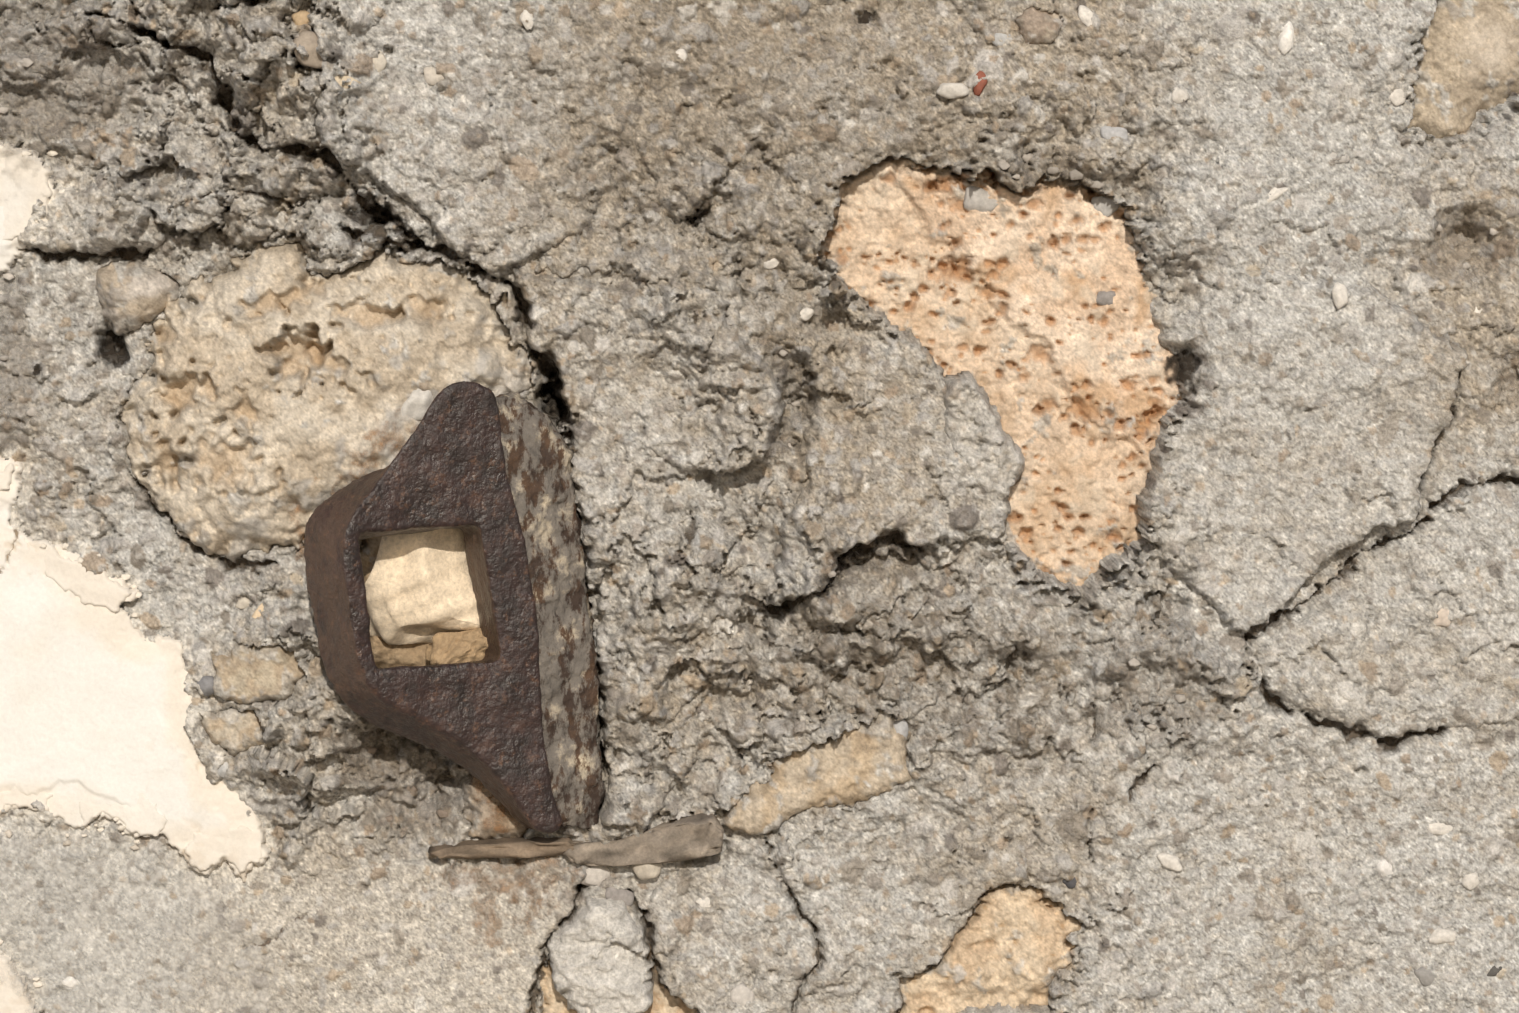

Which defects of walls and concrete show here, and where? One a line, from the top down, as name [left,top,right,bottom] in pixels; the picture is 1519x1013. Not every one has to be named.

spalling [0,2,147,242]
crack [217,0,272,9]
flaking render [1407,0,1519,139]
crack [20,247,149,263]
crack [88,2,574,439]
flaking render [119,242,535,563]
flaking render [816,147,1186,590]
flaking render [18,531,143,617]
crack [1242,474,1519,750]
crack [529,884,587,1013]
crack [627,889,700,1013]
flaking render [900,883,1083,1013]